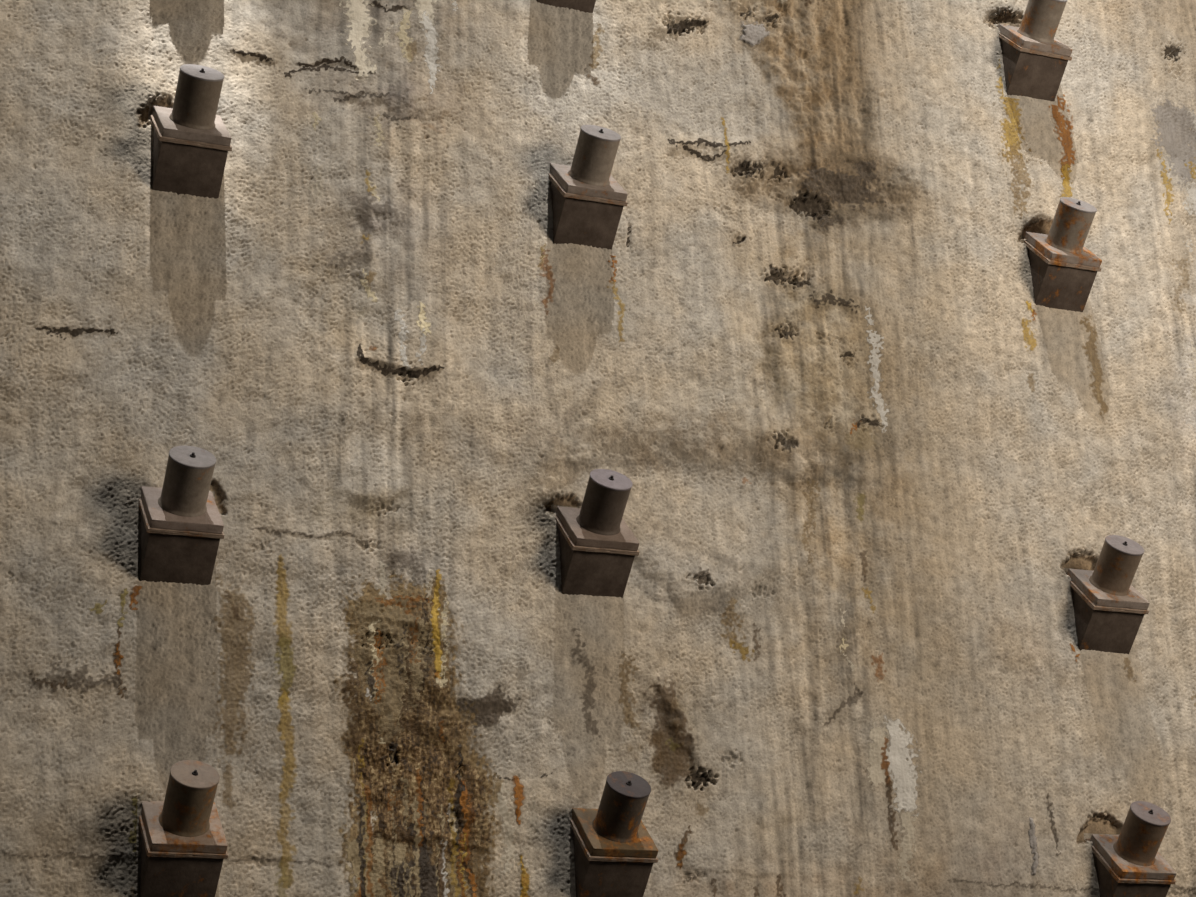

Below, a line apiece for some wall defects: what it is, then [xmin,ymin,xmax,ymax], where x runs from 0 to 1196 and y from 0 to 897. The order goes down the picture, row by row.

spalling [667,19,709,35]
crack [233,48,376,78]
spalling [709,0,922,230]
corrosion [996,59,1041,219]
corrosion [1049,94,1075,197]
crack [36,326,118,340]
crack [357,343,444,384]